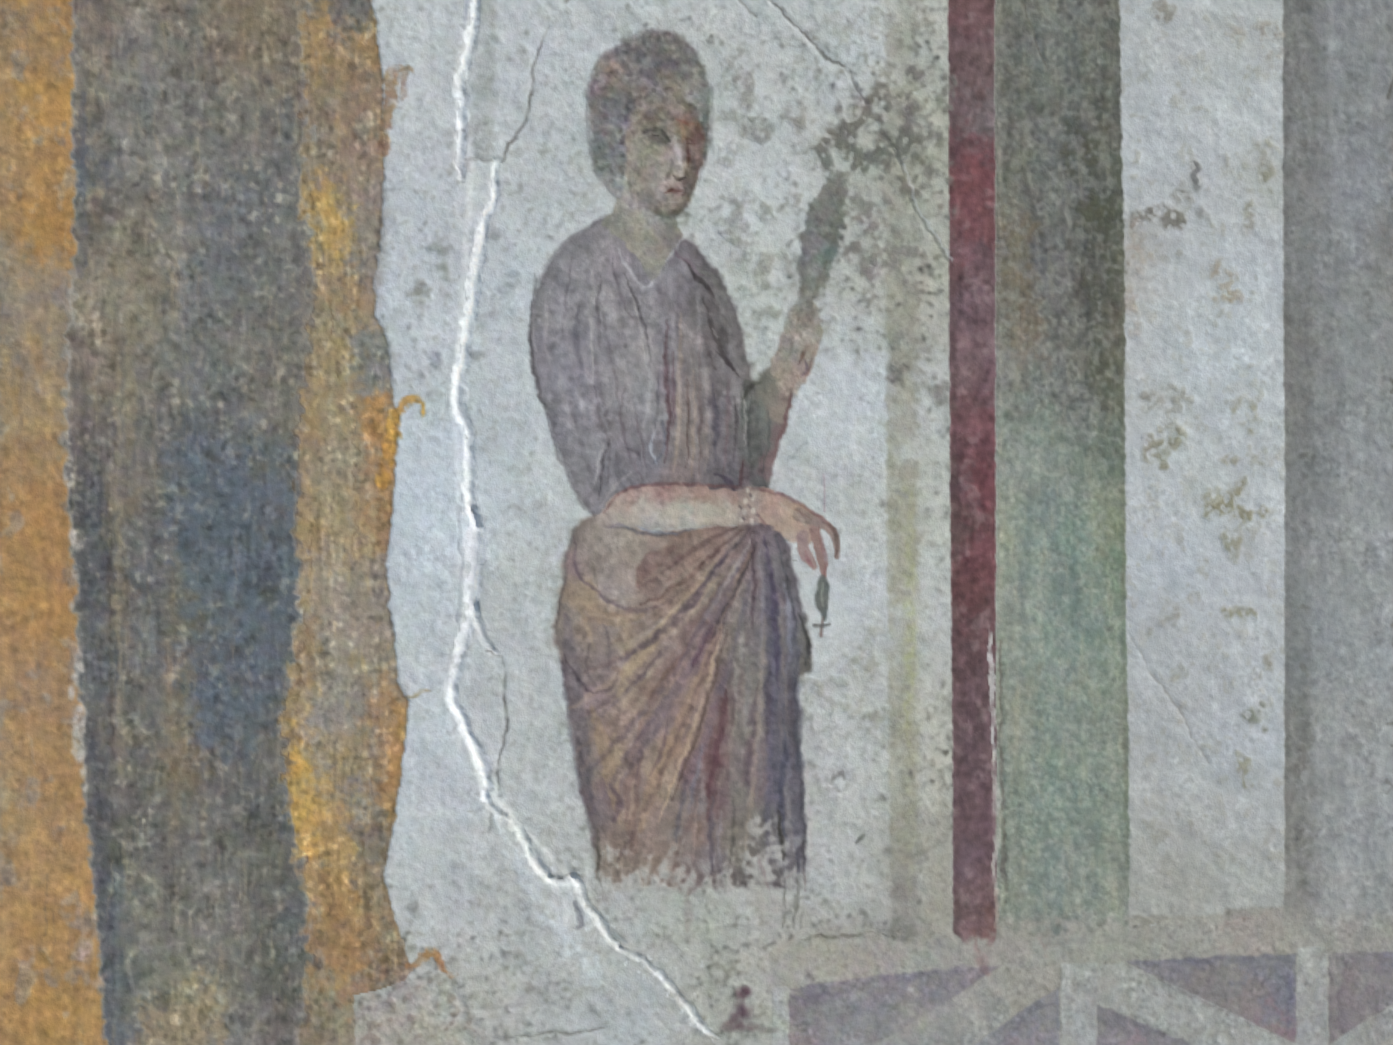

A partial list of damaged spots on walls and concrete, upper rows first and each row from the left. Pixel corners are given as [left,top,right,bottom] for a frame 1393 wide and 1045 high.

crack [738,0,868,105]
crack [881,135,951,262]
crack [444,0,720,1041]